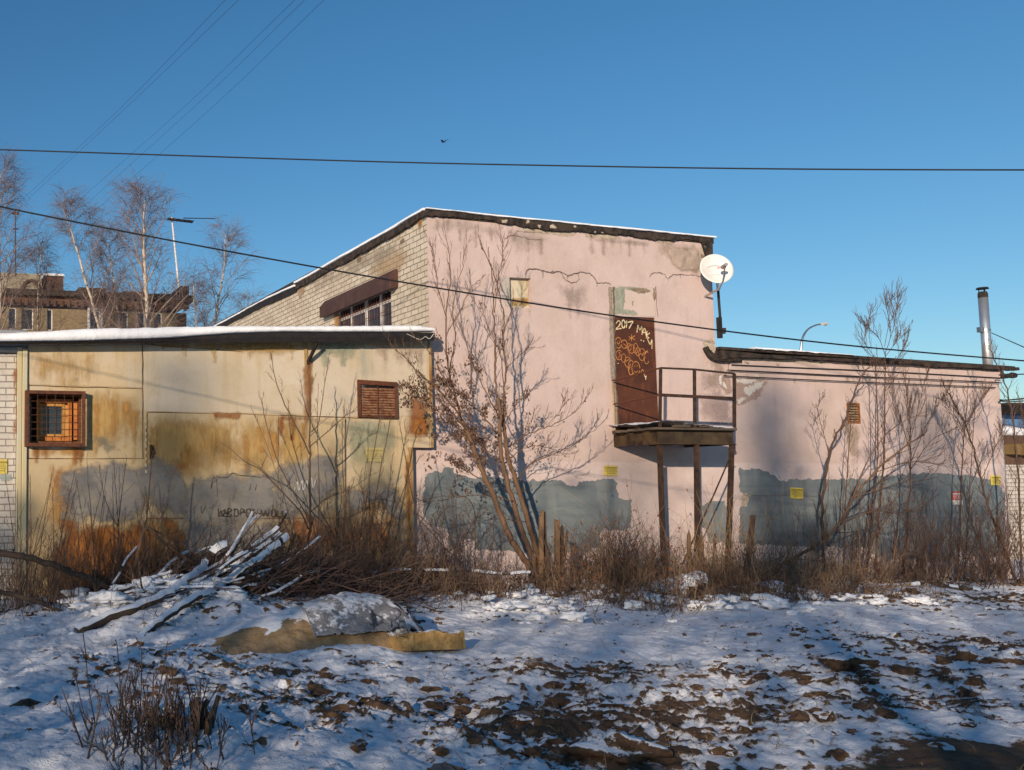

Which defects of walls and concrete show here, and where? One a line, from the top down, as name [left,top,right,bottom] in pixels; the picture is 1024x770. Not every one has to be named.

rust [148,362,313,473]
rust [410,398,429,435]
crack [525,268,619,430]
peeling [613,286,656,316]
peeling [719,358,829,407]
rust [33,394,185,594]